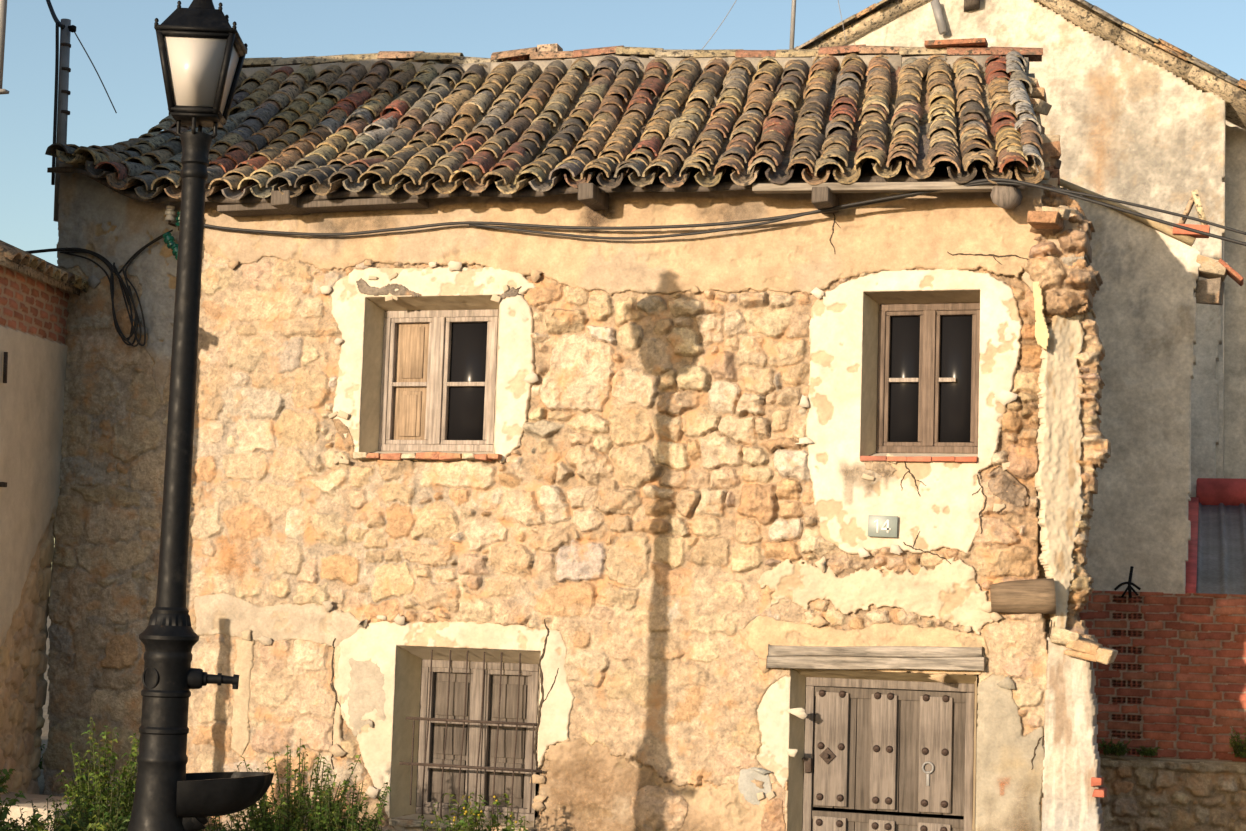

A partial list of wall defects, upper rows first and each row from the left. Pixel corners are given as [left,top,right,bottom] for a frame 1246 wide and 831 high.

crack [829,213,840,253]
crack [900,462,927,497]
flaking render [194,183,1104,831]
crack [1031,736,1045,770]